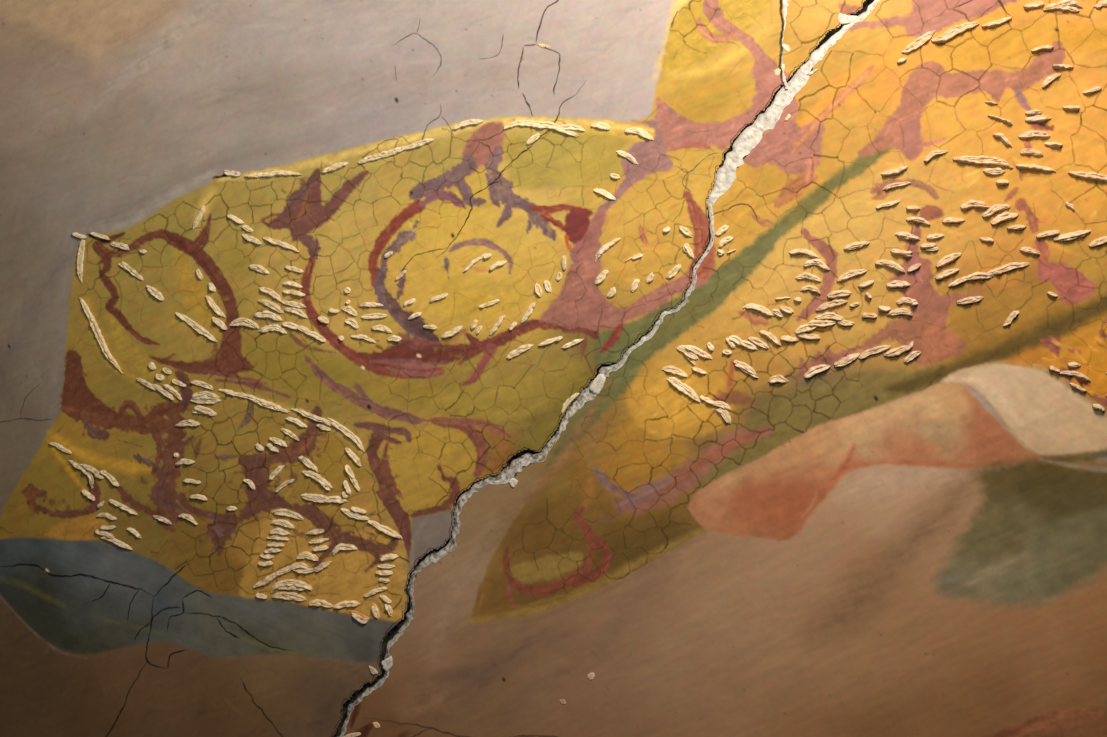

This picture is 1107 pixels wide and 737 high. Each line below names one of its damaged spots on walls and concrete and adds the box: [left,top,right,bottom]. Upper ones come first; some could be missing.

peeling [562,393,579,414]
crack [332,0,880,737]
crack [14,564,285,667]